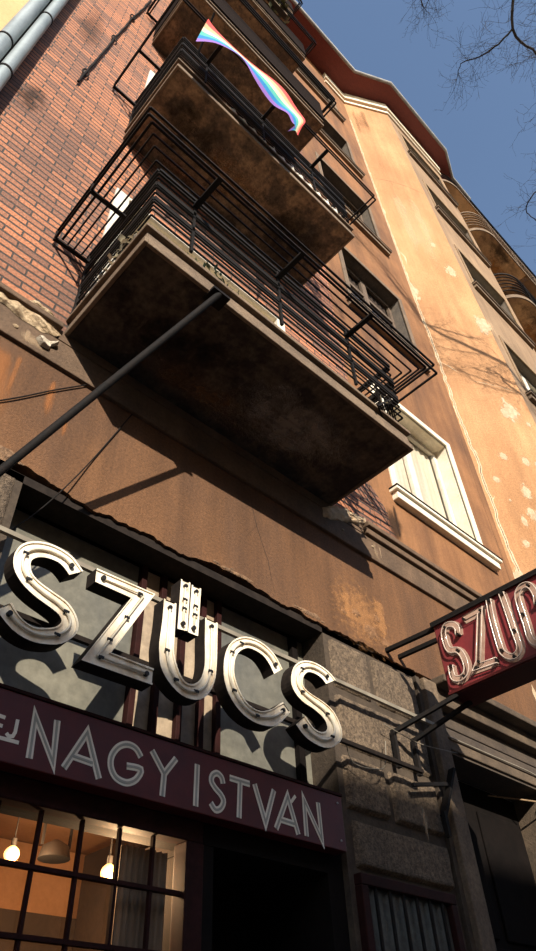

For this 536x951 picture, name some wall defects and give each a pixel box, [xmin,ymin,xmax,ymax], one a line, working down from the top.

spalling [0,291,60,350]
crack [350,119,520,580]
spalling [500,397,531,427]
spalling [322,484,397,539]
spalling [521,483,536,526]